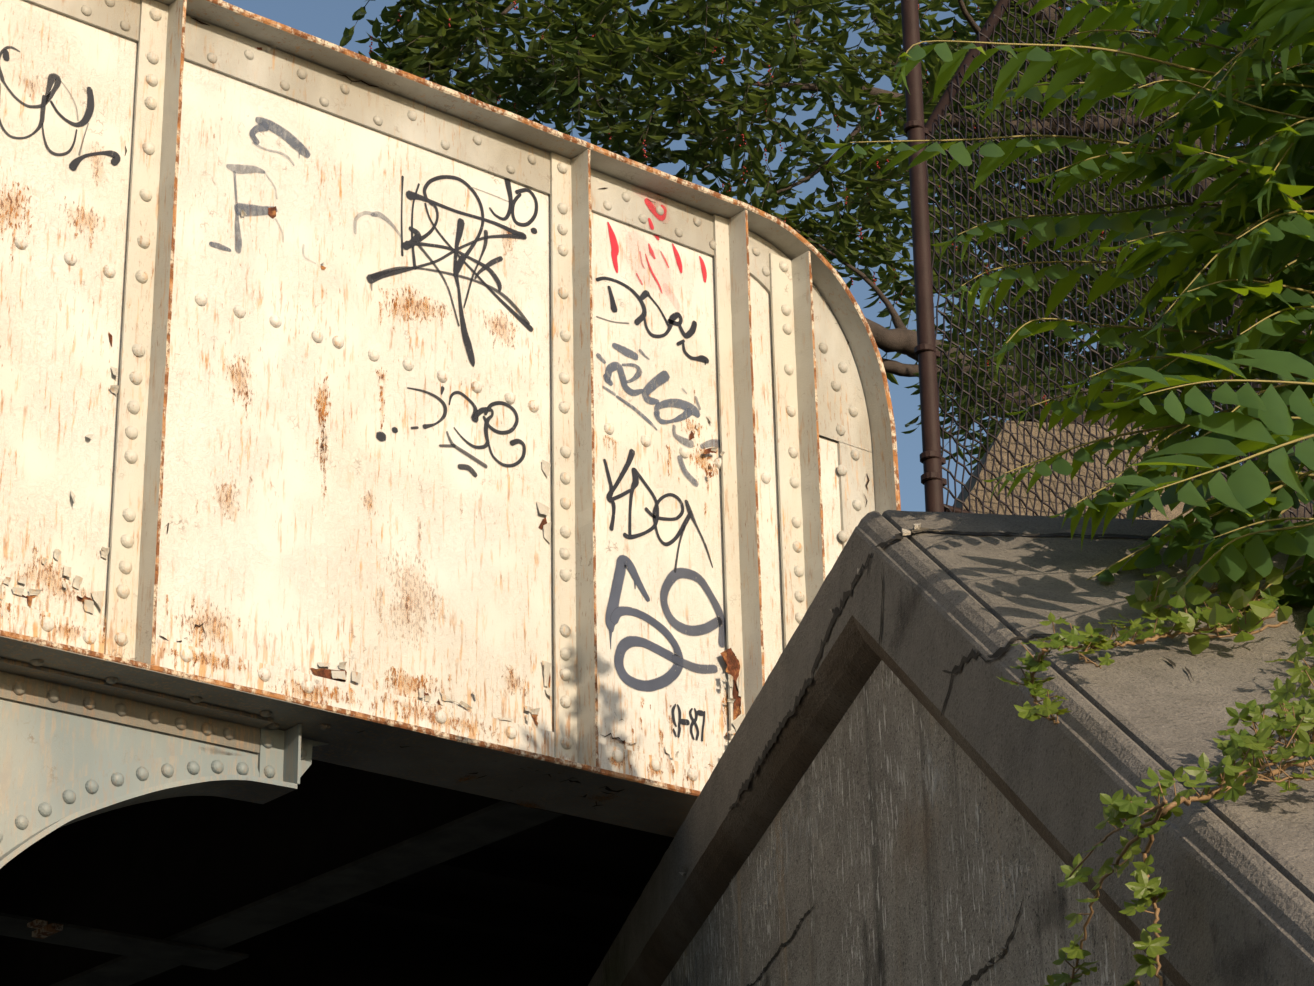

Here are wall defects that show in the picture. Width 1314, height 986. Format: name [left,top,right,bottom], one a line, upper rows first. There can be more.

corrosion [0,182,32,262]
corrosion [379,288,452,329]
corrosion [680,419,718,514]
peeling [0,577,42,607]
peeling [42,549,105,614]
corrosion [164,595,246,671]
peeling [310,662,361,684]
corrosion [275,668,500,742]
crack [728,530,1176,813]
crack [747,901,816,986]
crack [962,899,1023,986]